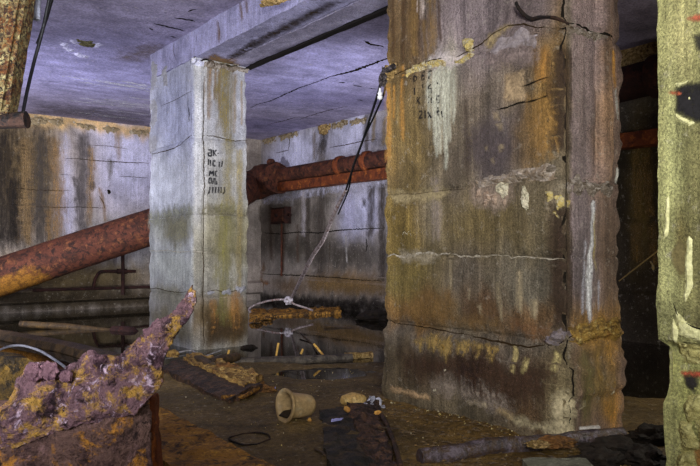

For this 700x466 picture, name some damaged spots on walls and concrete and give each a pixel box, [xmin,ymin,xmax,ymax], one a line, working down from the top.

crack [251,40,387,124]
water stain [406,38,474,133]
crack [394,0,612,76]
crack [496,77,548,110]
water stain [0,128,49,248]
water stain [74,137,95,229]
corrosion [0,270,46,297]
corrosion [208,299,245,341]
water stain [265,181,446,294]
crack [386,318,543,348]
crack [561,84,575,423]
water stain [545,191,624,346]